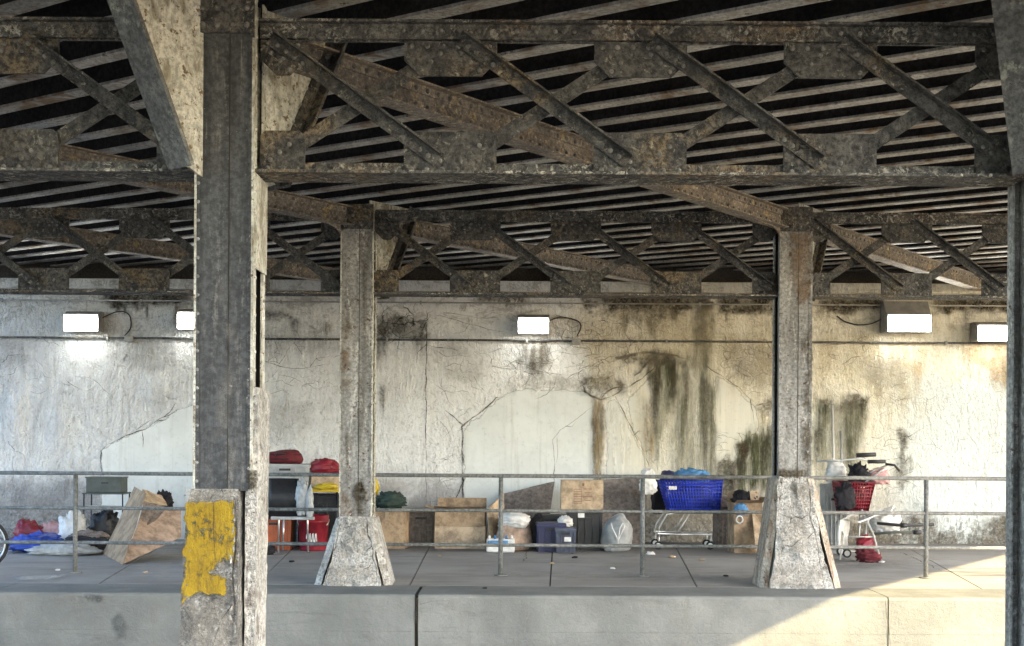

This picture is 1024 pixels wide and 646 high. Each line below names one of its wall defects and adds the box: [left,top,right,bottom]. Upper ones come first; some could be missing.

crack [100,396,178,471]
crack [376,303,678,502]
leakage [581,292,772,491]
leakage [815,407,829,460]
leakage [844,399,866,459]
peeling [180,494,241,607]